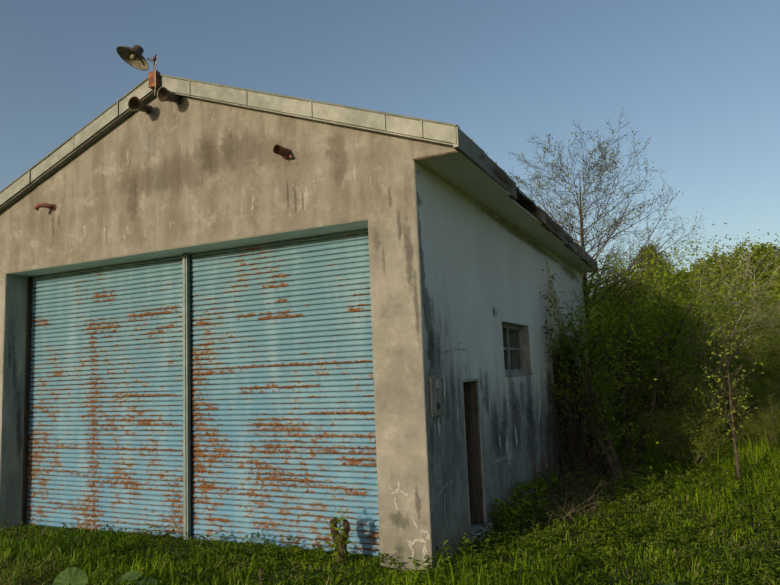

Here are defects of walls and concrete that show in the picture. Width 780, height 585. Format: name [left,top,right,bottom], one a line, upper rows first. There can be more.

rust [262,273,291,289]
rust [93,290,119,304]
rust [236,299,305,322]
rust [26,305,182,530]
rust [156,348,377,538]